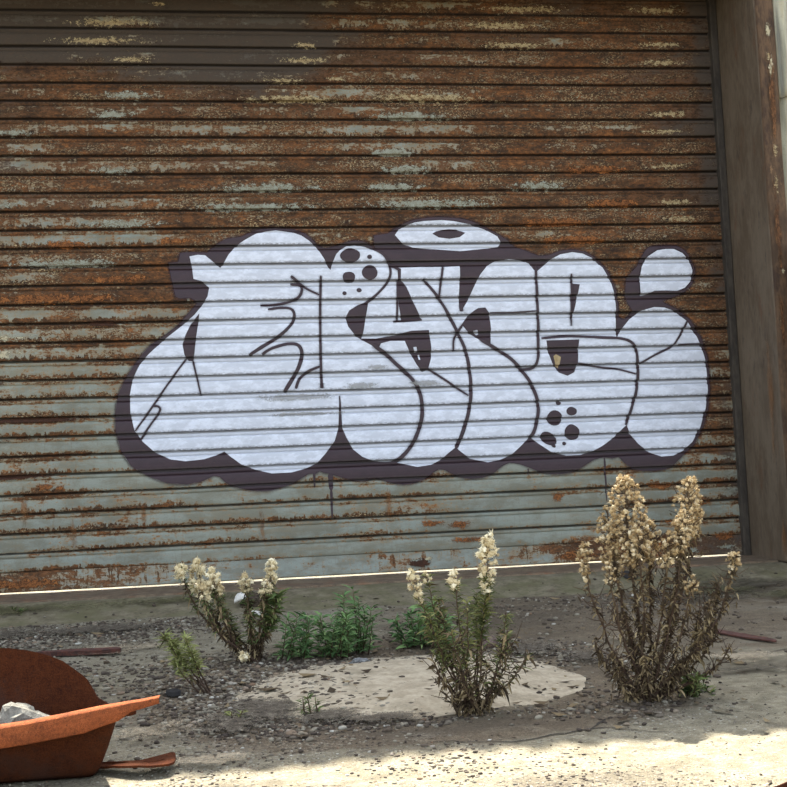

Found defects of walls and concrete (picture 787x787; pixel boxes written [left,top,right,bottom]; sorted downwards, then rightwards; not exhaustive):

peeling [445,4,566,31]
peeling [280,41,326,65]
peeling [89,108,135,121]
peeling [104,90,148,100]
peeling [237,93,506,121]
peeling [355,147,502,210]
peeling [183,183,326,213]
peeling [78,219,162,229]
rust [504,218,615,245]
peeling [7,258,119,270]
rust [422,520,481,543]
rust [0,578,63,589]